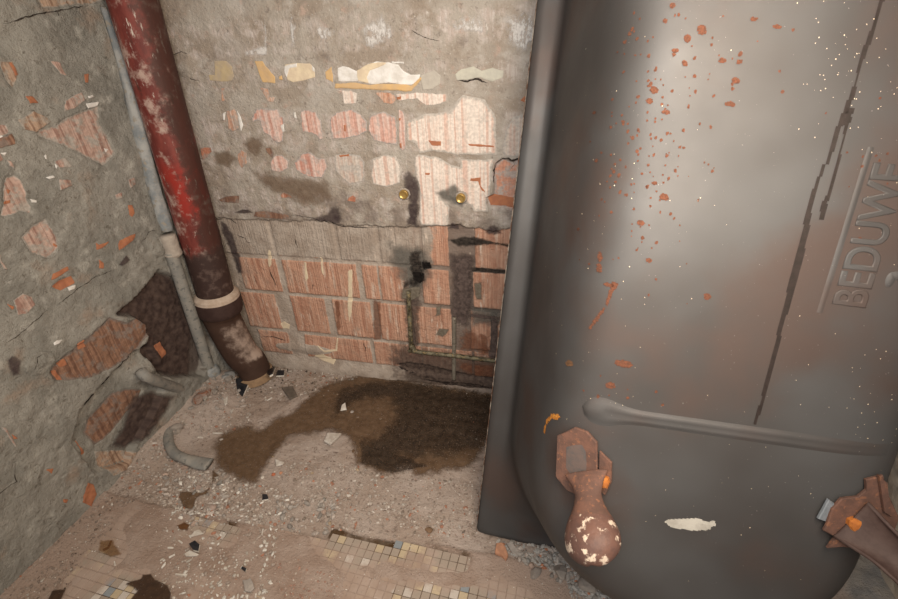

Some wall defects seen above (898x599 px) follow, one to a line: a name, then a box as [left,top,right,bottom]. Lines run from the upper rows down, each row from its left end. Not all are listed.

flaking render [223,61,523,226]
leakage [405,173,419,227]
leakage [440,186,462,205]
flaking render [51,267,76,291]
spalling [50,317,148,381]
leakage [179,222,508,509]
spalling [75,389,141,476]
flaking render [83,483,97,506]
leakage [49,589,65,599]
leakage [127,574,170,599]